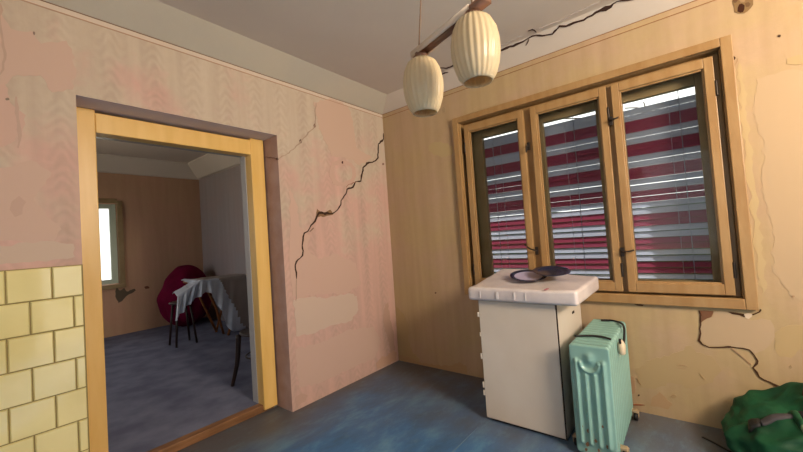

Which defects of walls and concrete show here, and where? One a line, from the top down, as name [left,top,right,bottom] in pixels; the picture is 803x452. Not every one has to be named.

crack [500,0,630,51]
crack [267,105,317,159]
crack [295,133,384,299]
crack [698,310,779,387]